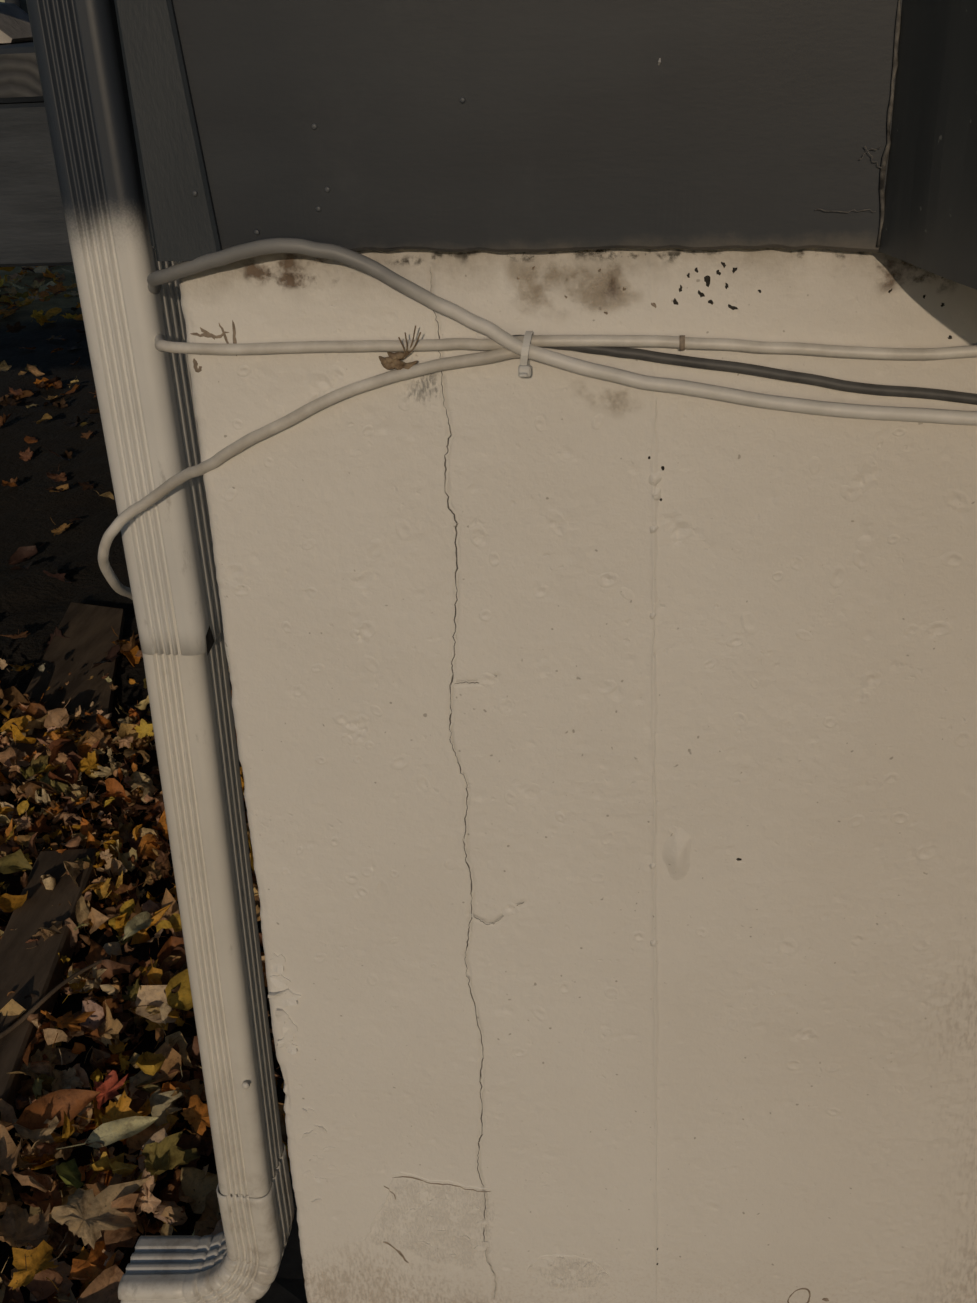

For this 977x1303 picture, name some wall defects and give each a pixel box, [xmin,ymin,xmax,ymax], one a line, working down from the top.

water stain [673,262,738,310]
crack [430,272,524,1297]
spalling [268,953,301,1055]